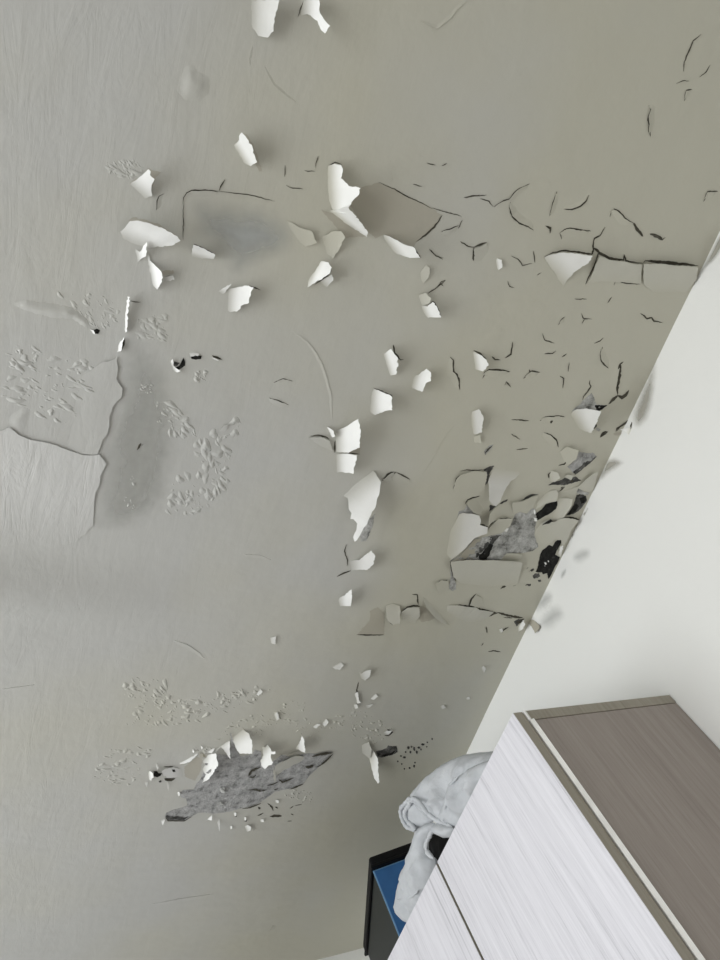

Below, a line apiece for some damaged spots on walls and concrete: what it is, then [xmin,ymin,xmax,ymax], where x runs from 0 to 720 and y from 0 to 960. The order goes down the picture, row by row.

peeling [251,0,279,37]
peeling [120,217,180,289]
crack [156,158,318,231]
peeling [288,162,460,318]
crack [429,184,664,293]
crack [447,357,460,390]
crack [505,298,588,387]
crack [596,338,629,404]
crack [484,415,564,455]
peeling [336,419,381,577]
spalling [436,447,598,594]
spalling [145,730,333,832]